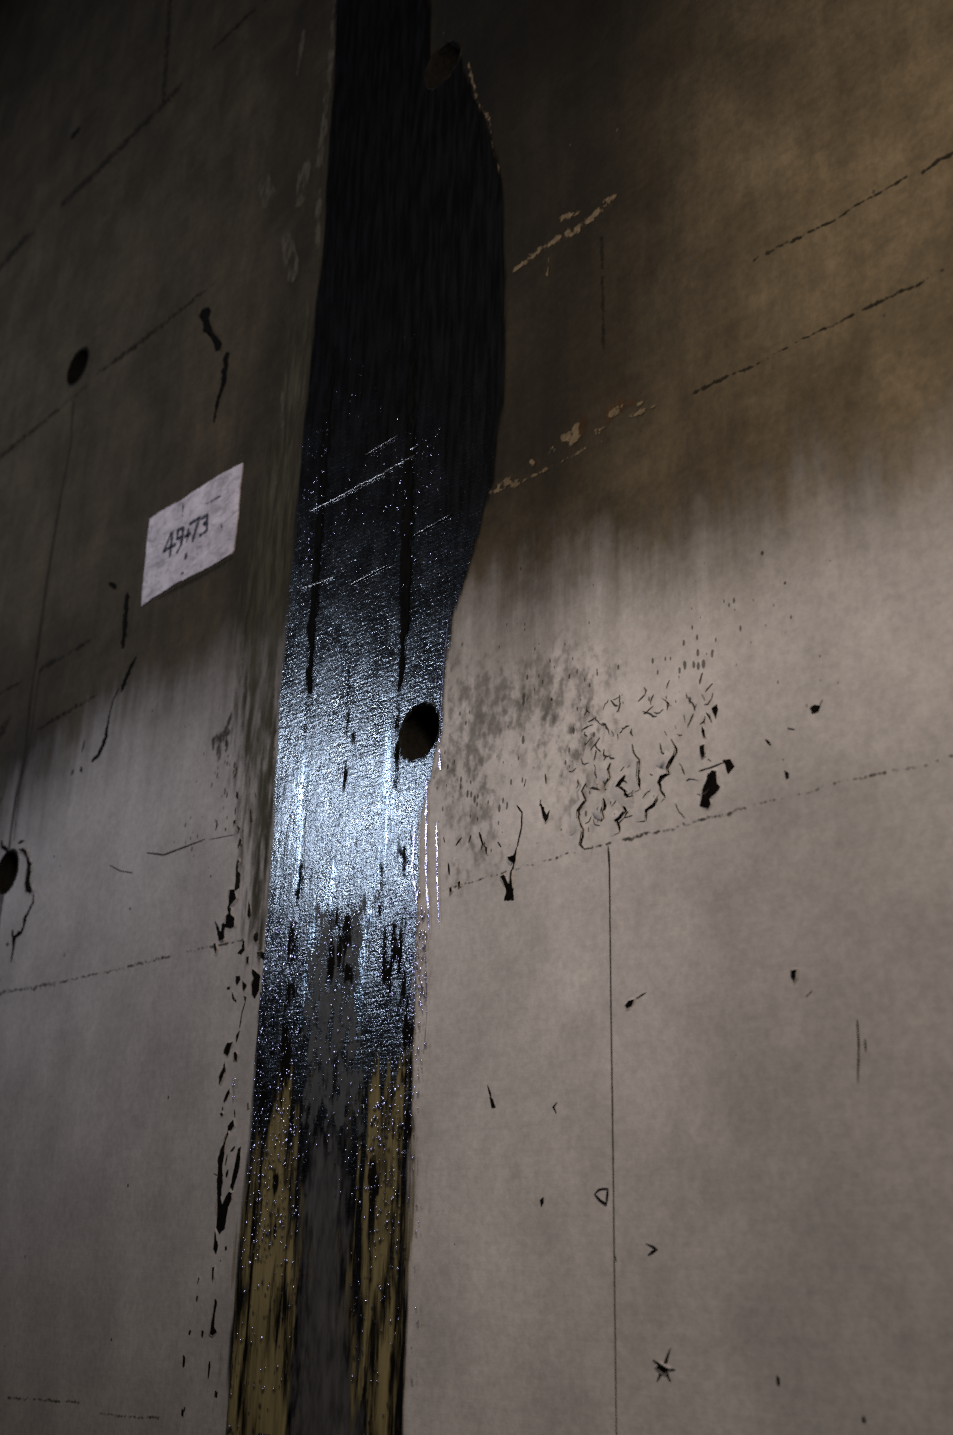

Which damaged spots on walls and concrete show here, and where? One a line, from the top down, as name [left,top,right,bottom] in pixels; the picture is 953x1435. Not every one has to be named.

crack [198,307,229,423]
crack [1,840,35,961]
crack [71,582,136,775]
damp [211,0,655,1435]
spalling [443,806,523,901]
peeling [539,799,550,825]
peeling [568,672,734,863]
spalling [188,769,265,1338]